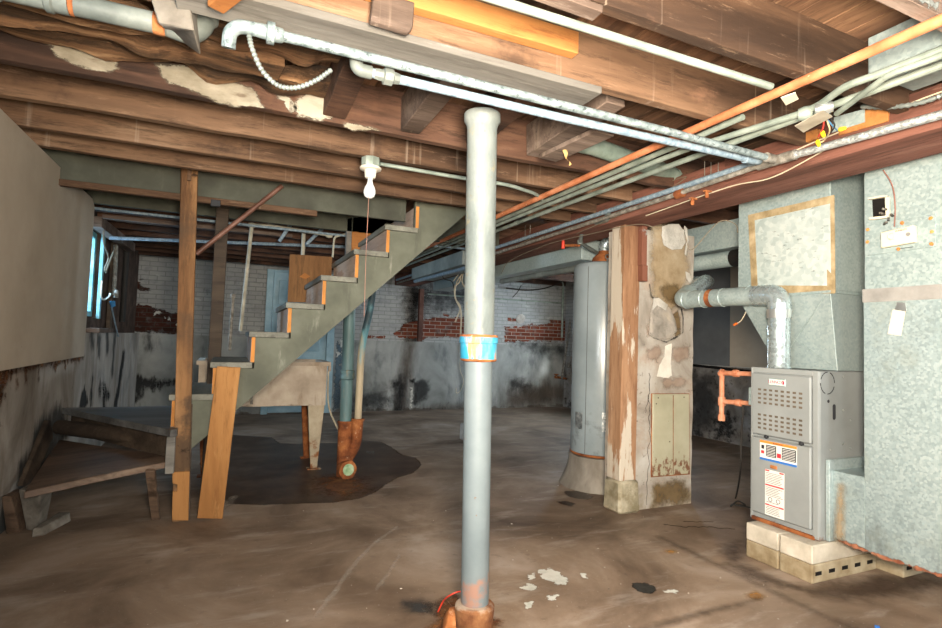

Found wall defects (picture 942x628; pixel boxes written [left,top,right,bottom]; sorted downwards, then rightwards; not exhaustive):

peeling [48,44,118,72]
peeling [155,63,264,108]
peeling [277,94,333,121]
peeling [344,123,379,131]
flaking render [135,303,177,335]
flaking render [367,313,464,340]
corrosion [0,369,12,404]
leakage [79,330,125,407]
leakage [135,374,176,402]
leakage [352,338,417,412]
corrosion [836,487,942,578]
corrosion [405,594,459,628]